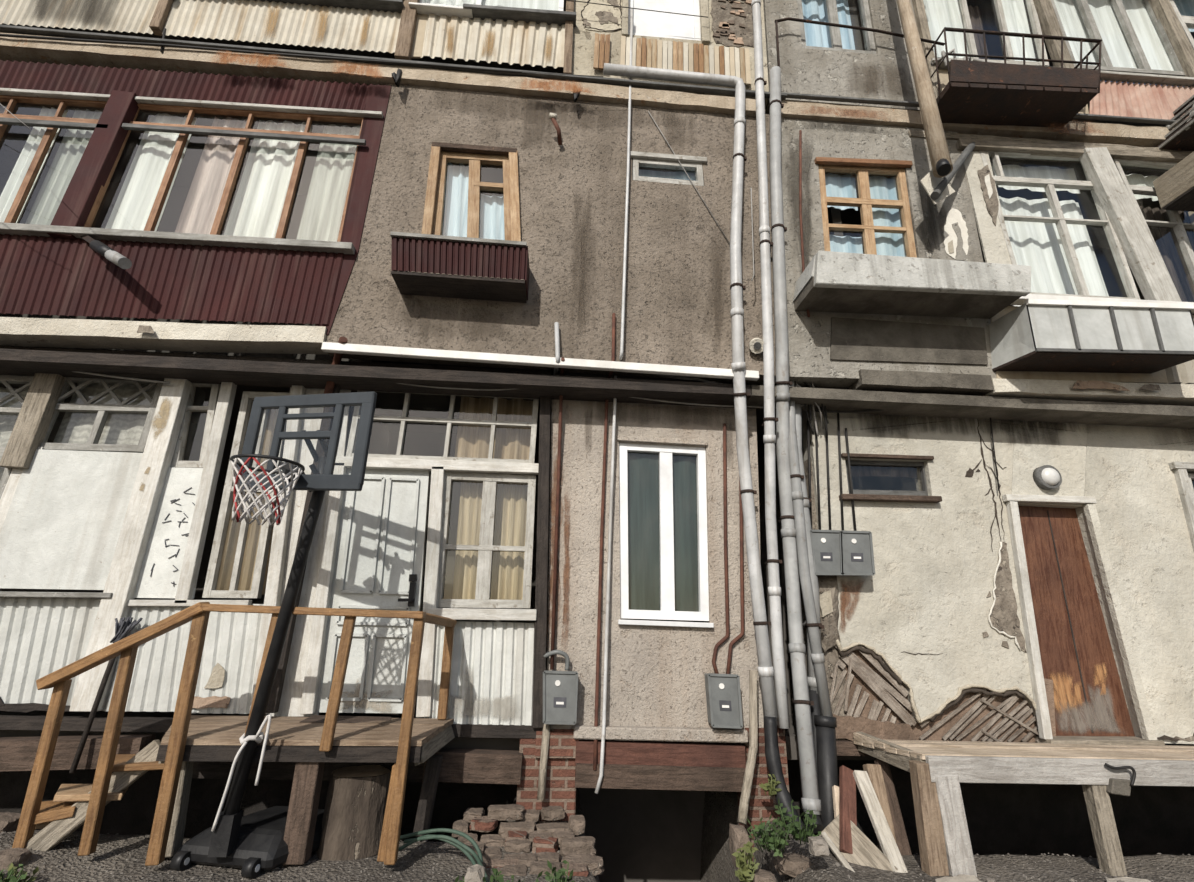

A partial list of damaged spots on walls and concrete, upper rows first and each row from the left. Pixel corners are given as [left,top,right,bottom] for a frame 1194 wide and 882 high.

flaking render [581,0,622,32]
flaking render [710,0,754,47]
peeling [943,208,969,261]
crack [966,419,1007,552]
flaking render [982,541,1027,653]
flaking render [830,639,1040,743]